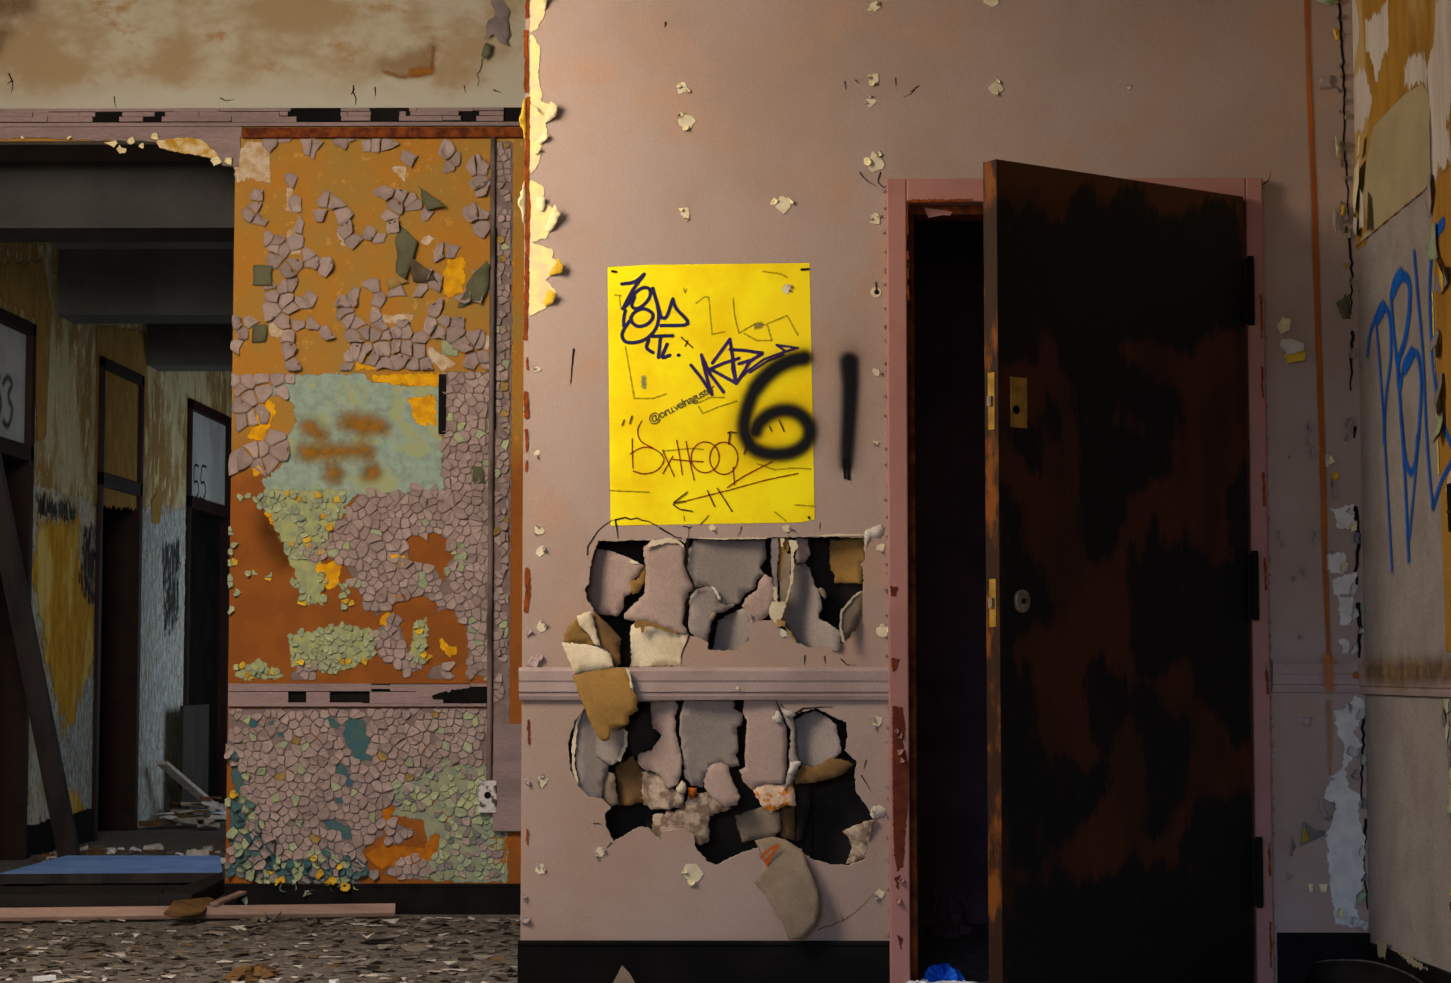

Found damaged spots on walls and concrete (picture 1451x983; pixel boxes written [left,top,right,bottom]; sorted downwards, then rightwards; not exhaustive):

crack [1338,0,1355,391]
peeling [0,0,564,905]
peeling [864,484,898,596]
peeling [876,615,900,672]
peeling [1264,299,1428,983]
peeling [772,710,796,723]
peeling [788,761,801,774]
peeling [1441,697,1451,819]
peeling [680,863,704,886]